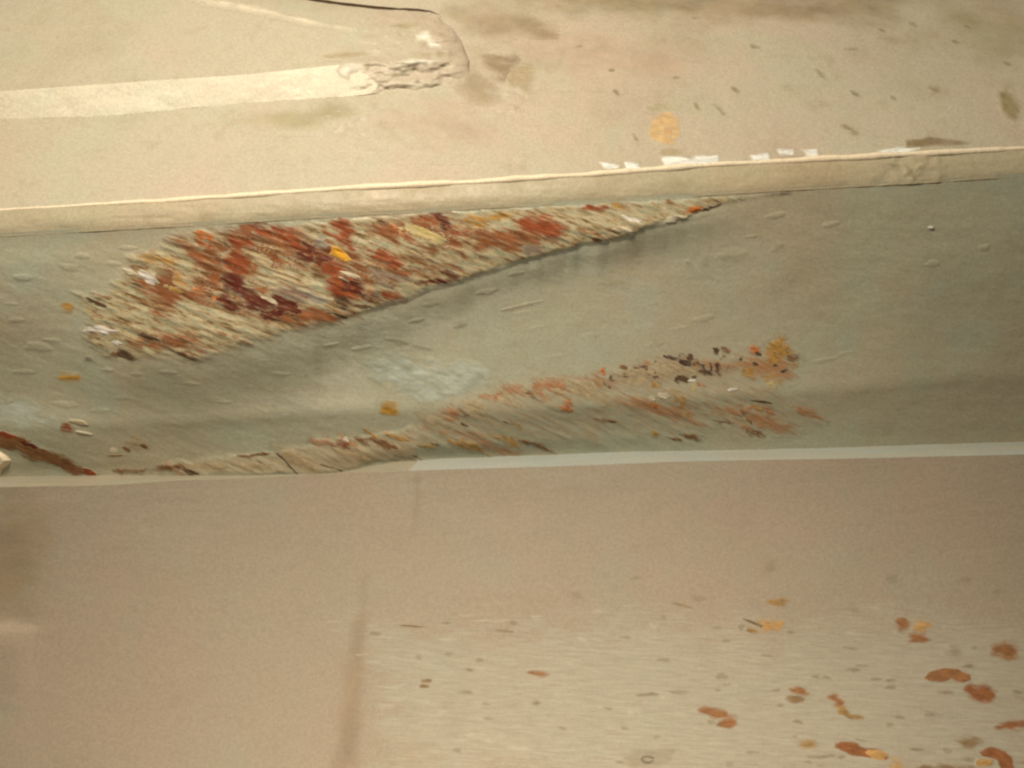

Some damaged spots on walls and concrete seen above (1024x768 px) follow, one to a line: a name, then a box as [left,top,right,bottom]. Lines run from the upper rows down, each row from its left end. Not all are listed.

rust [643,100,684,156]
rust [373,334,830,461]
rust [0,414,100,476]
rust [744,595,794,638]
rust [887,613,937,646]
rust [986,634,1024,666]
rust [693,702,742,734]
rust [780,666,1024,768]